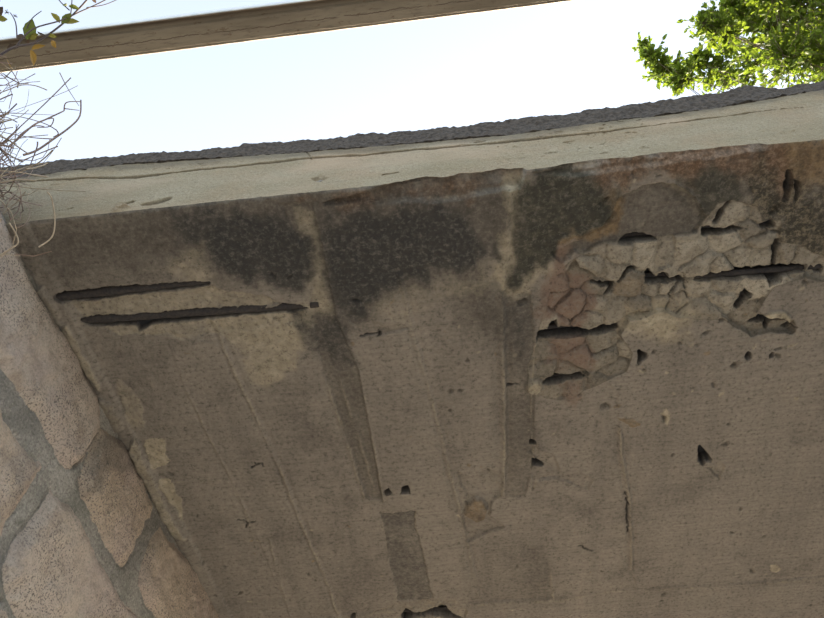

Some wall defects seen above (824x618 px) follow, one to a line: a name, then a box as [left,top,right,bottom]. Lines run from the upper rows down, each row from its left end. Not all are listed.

spalling [36,284,306,342]
water stain [6,172,561,394]
spalling [526,181,824,402]
hole [696,445,714,468]
peeling [371,510,470,618]
crack [623,491,631,533]